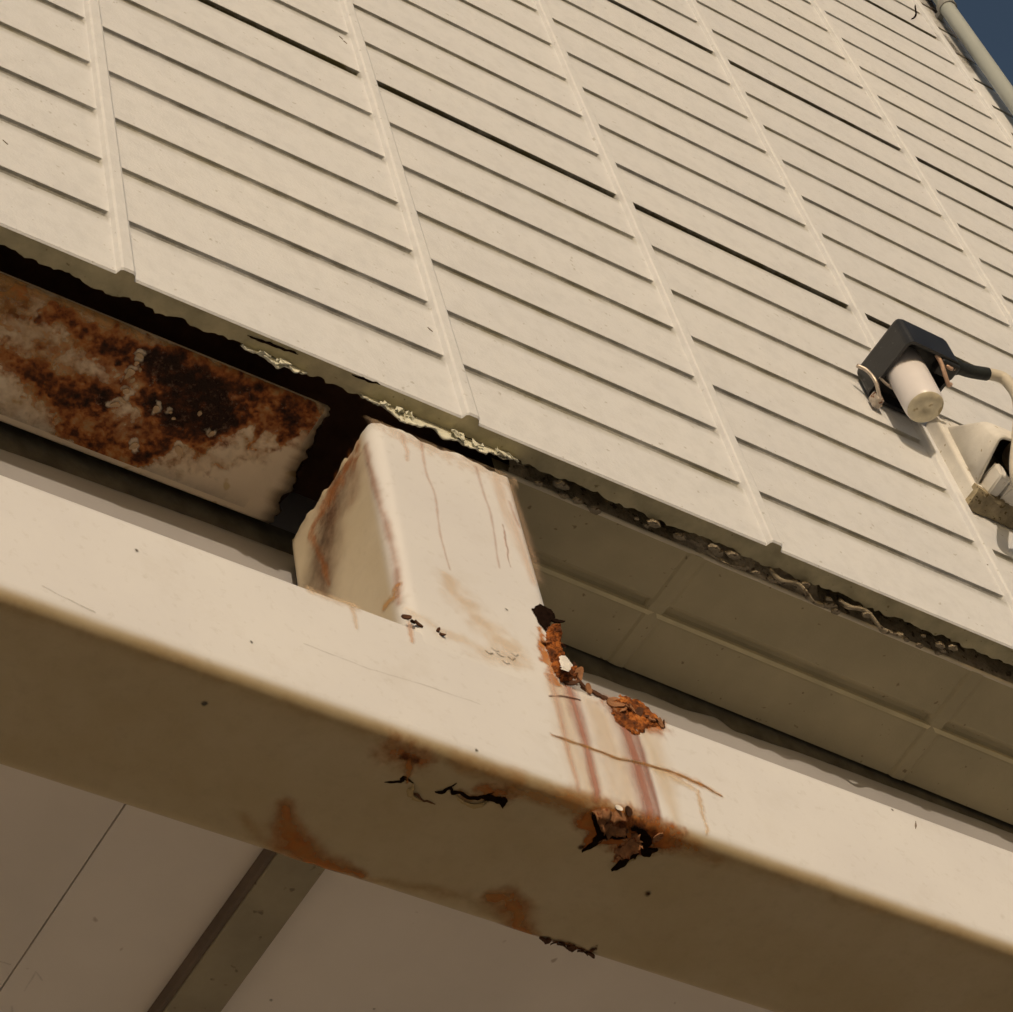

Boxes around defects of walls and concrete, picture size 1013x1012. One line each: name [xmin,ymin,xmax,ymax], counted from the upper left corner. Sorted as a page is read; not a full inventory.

corrosion [0,273,322,468]
peeling [541,640,592,695]
corrosion [508,685,665,822]
crack [384,776,508,809]
corrosion [276,805,365,878]